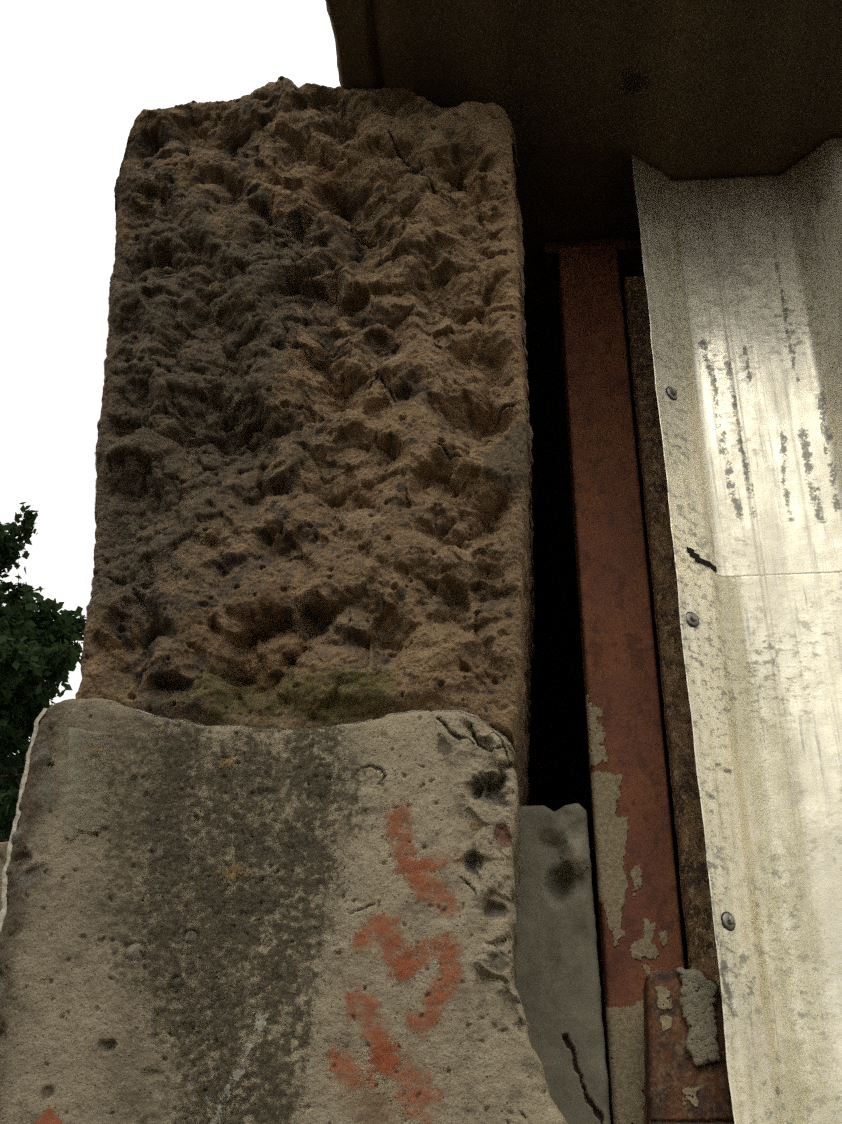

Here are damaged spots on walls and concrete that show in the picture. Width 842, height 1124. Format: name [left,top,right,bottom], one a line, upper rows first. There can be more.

damp [88,717,368,1124]
crack [437,718,509,759]
peeling [586,694,673,1124]
peeling [682,1087,700,1107]